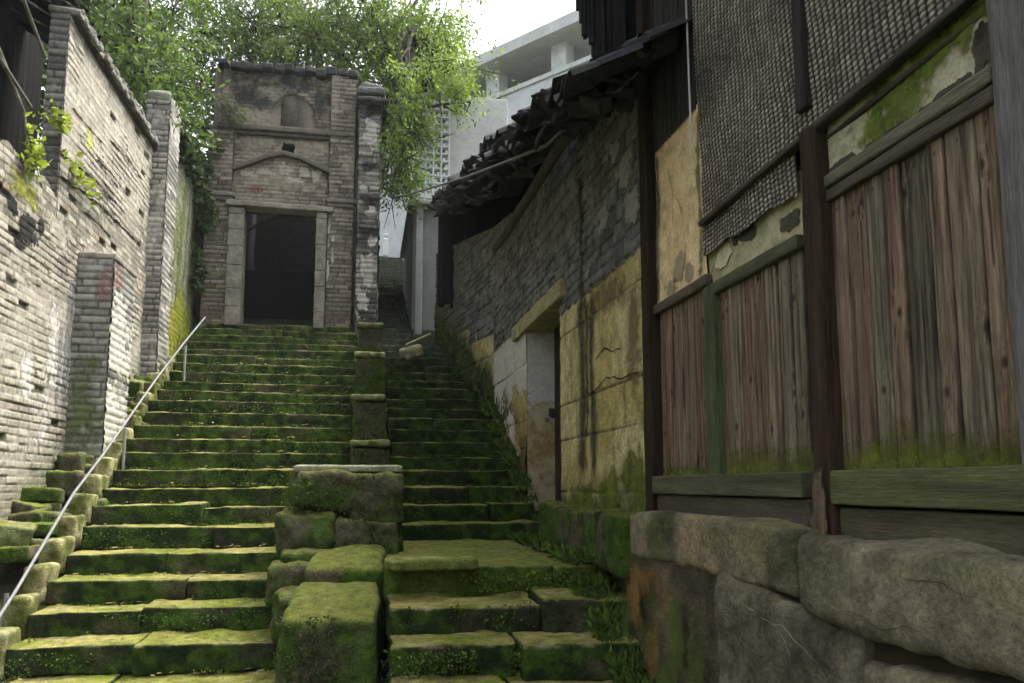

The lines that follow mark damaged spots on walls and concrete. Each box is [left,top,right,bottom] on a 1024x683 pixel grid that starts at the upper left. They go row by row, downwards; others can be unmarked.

flaking render [829,21,991,173]
spalling [362,117,378,153]
leakage [170,179,201,326]
spalling [355,236,378,320]
flaking render [711,223,756,269]
flaking render [777,198,799,233]
spalling [0,180,96,446]
leakage [577,174,641,472]
crack [590,332,639,396]
rust [626,565,661,623]
crack [746,606,816,670]